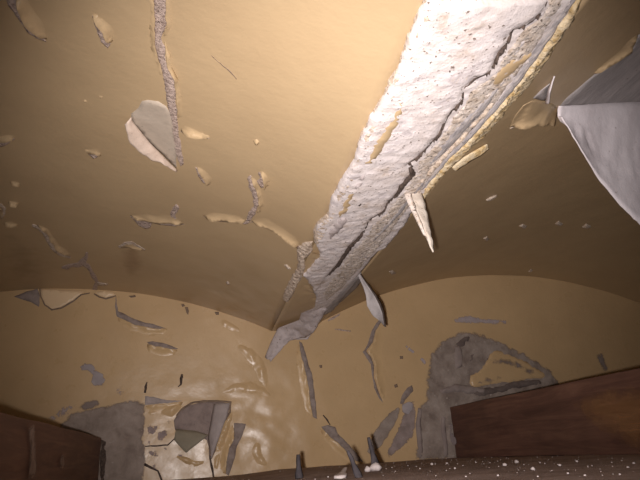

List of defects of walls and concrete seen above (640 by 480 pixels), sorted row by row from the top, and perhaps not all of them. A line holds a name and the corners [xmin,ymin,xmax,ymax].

peeling [6,0,47,42]
crack [149,0,184,166]
peeling [125,100,177,172]
peeling [510,34,640,225]
spalling [283,0,581,402]
peeling [14,289,178,356]
peeling [296,341,317,419]
peeling [144,382,246,477]
peeling [321,425,363,478]
peeling [368,385,415,455]